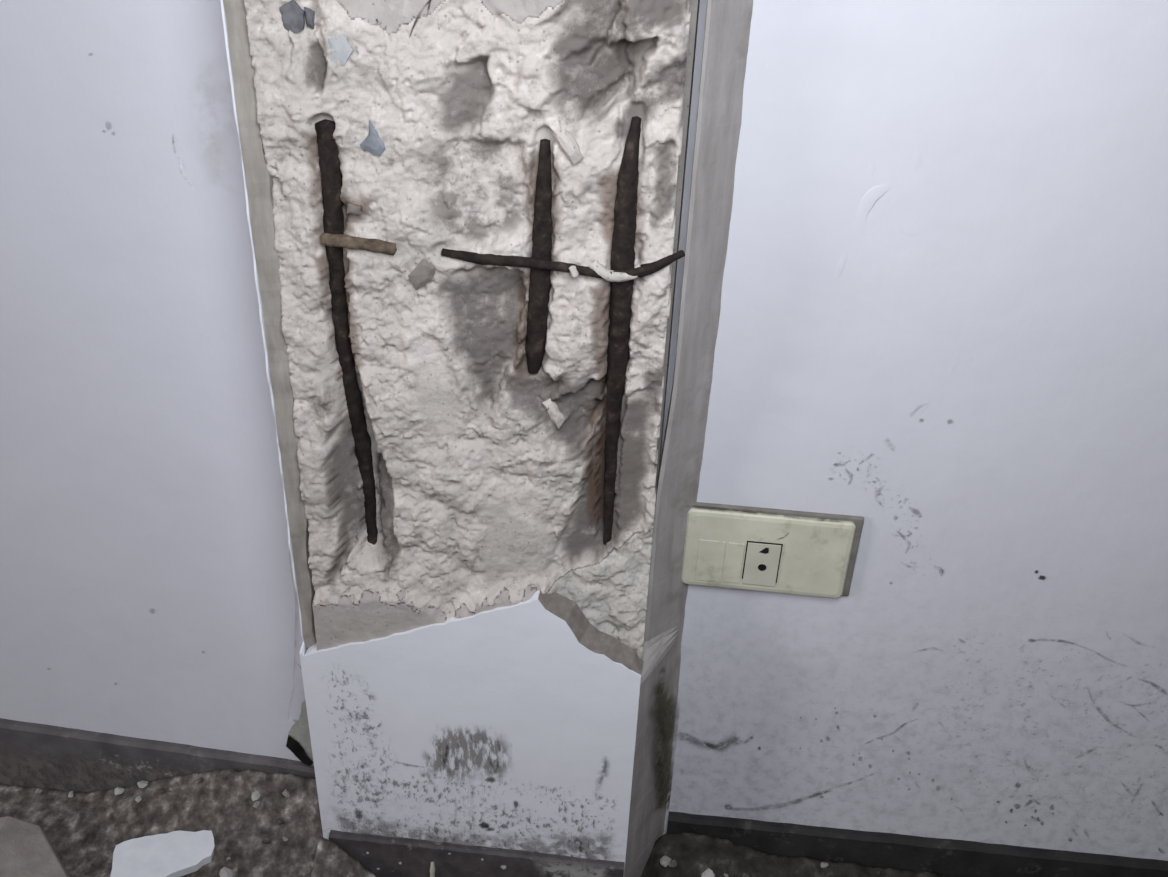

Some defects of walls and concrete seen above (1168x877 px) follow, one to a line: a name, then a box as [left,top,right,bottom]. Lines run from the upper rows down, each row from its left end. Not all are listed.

spalling [244,0,691,675]
damp [334,703,387,789]